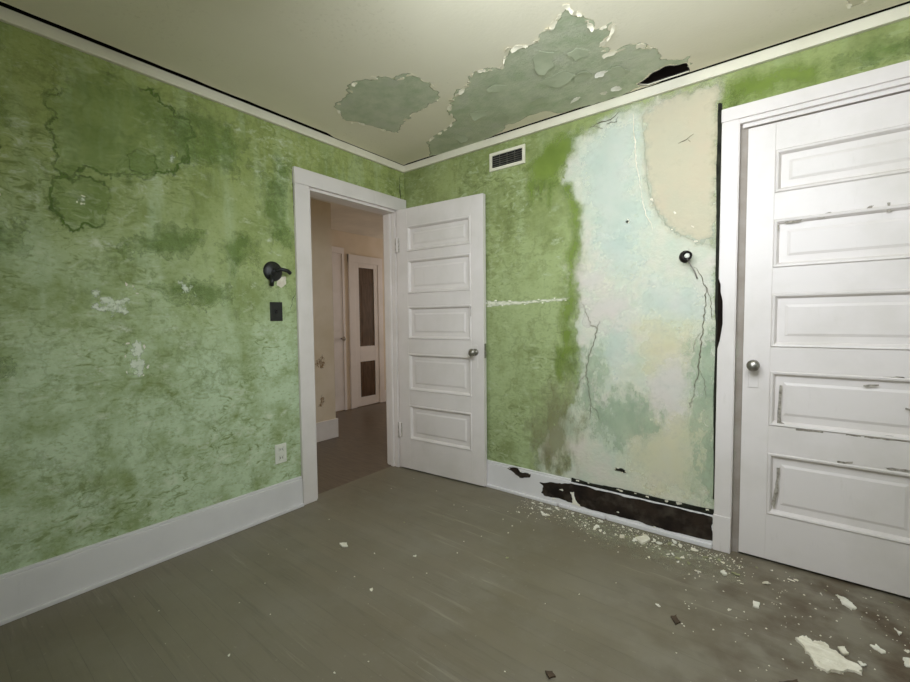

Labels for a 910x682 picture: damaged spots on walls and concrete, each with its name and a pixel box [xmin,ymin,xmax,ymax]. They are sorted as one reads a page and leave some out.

peeling [0,0,910,166]
water stain [44,87,236,232]
peeling [86,282,139,317]
peeling [125,340,149,377]
crack [578,297,600,420]
peeling [486,81,720,563]
crack [689,267,712,408]
peeling [777,385,823,433]
peeling [772,468,780,507]